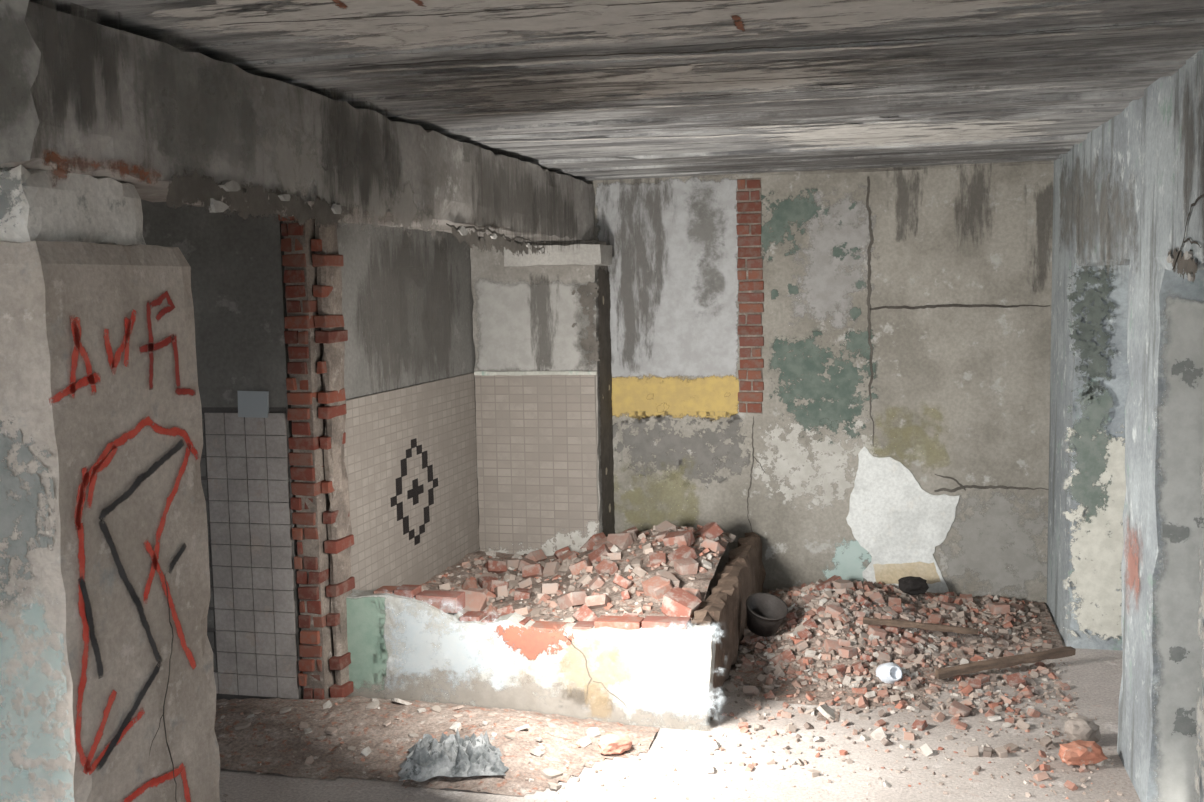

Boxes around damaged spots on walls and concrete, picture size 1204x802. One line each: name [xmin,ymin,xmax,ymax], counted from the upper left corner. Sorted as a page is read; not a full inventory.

crack [225,6,575,25]
crack [606,0,732,8]
damp [0,0,454,387]
damp [607,178,668,367]
damp [689,190,724,302]
crack [349,20,1194,446]
spalling [1166,248,1198,282]
flaking render [572,178,960,593]
peeling [1063,265,1126,641]
flaking render [493,625,574,661]
peeling [1153,297,1204,802]